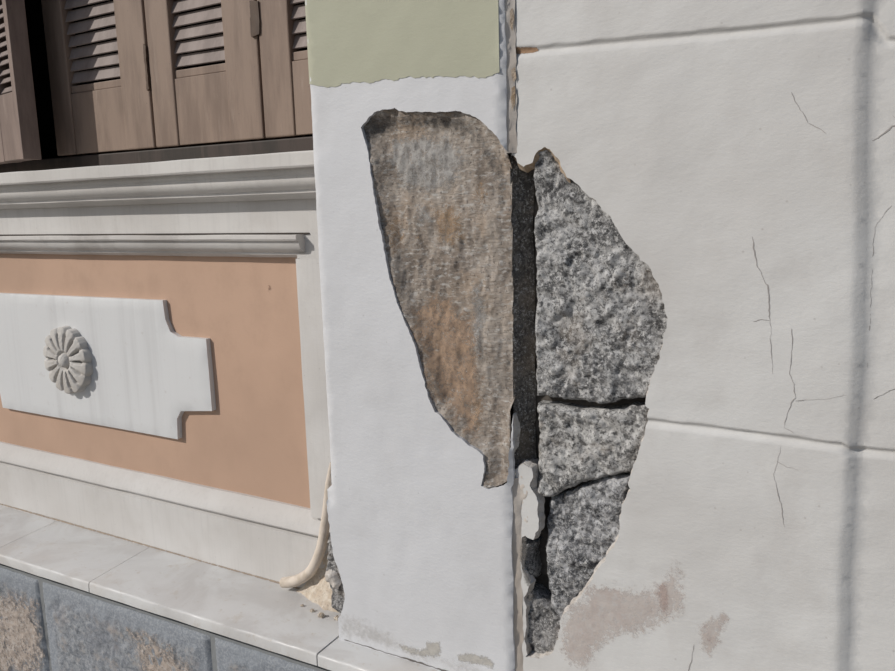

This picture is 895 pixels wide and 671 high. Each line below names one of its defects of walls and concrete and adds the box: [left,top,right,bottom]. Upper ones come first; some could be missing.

spalling [363,109,683,667]
crack [752,237,843,433]